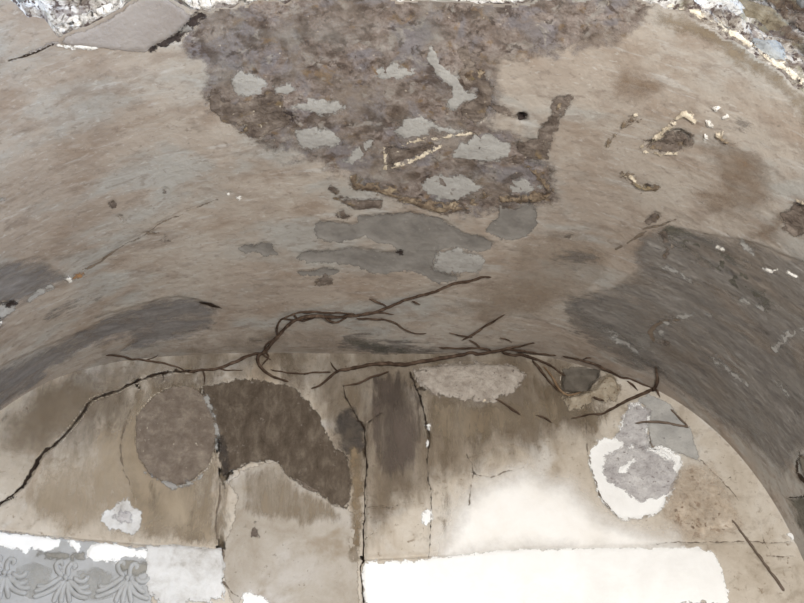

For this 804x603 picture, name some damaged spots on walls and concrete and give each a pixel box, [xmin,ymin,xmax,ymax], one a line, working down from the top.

spalling [8,0,648,286]
spalling [640,110,729,157]
spalling [780,199,804,237]
crack [0,369,192,504]
peeling [0,299,222,405]
peeling [100,498,142,535]
spalling [135,378,352,509]
crack [343,385,393,603]
water stain [372,377,420,475]
peeling [413,361,527,403]
spalling [588,402,683,521]
peeling [574,213,804,467]